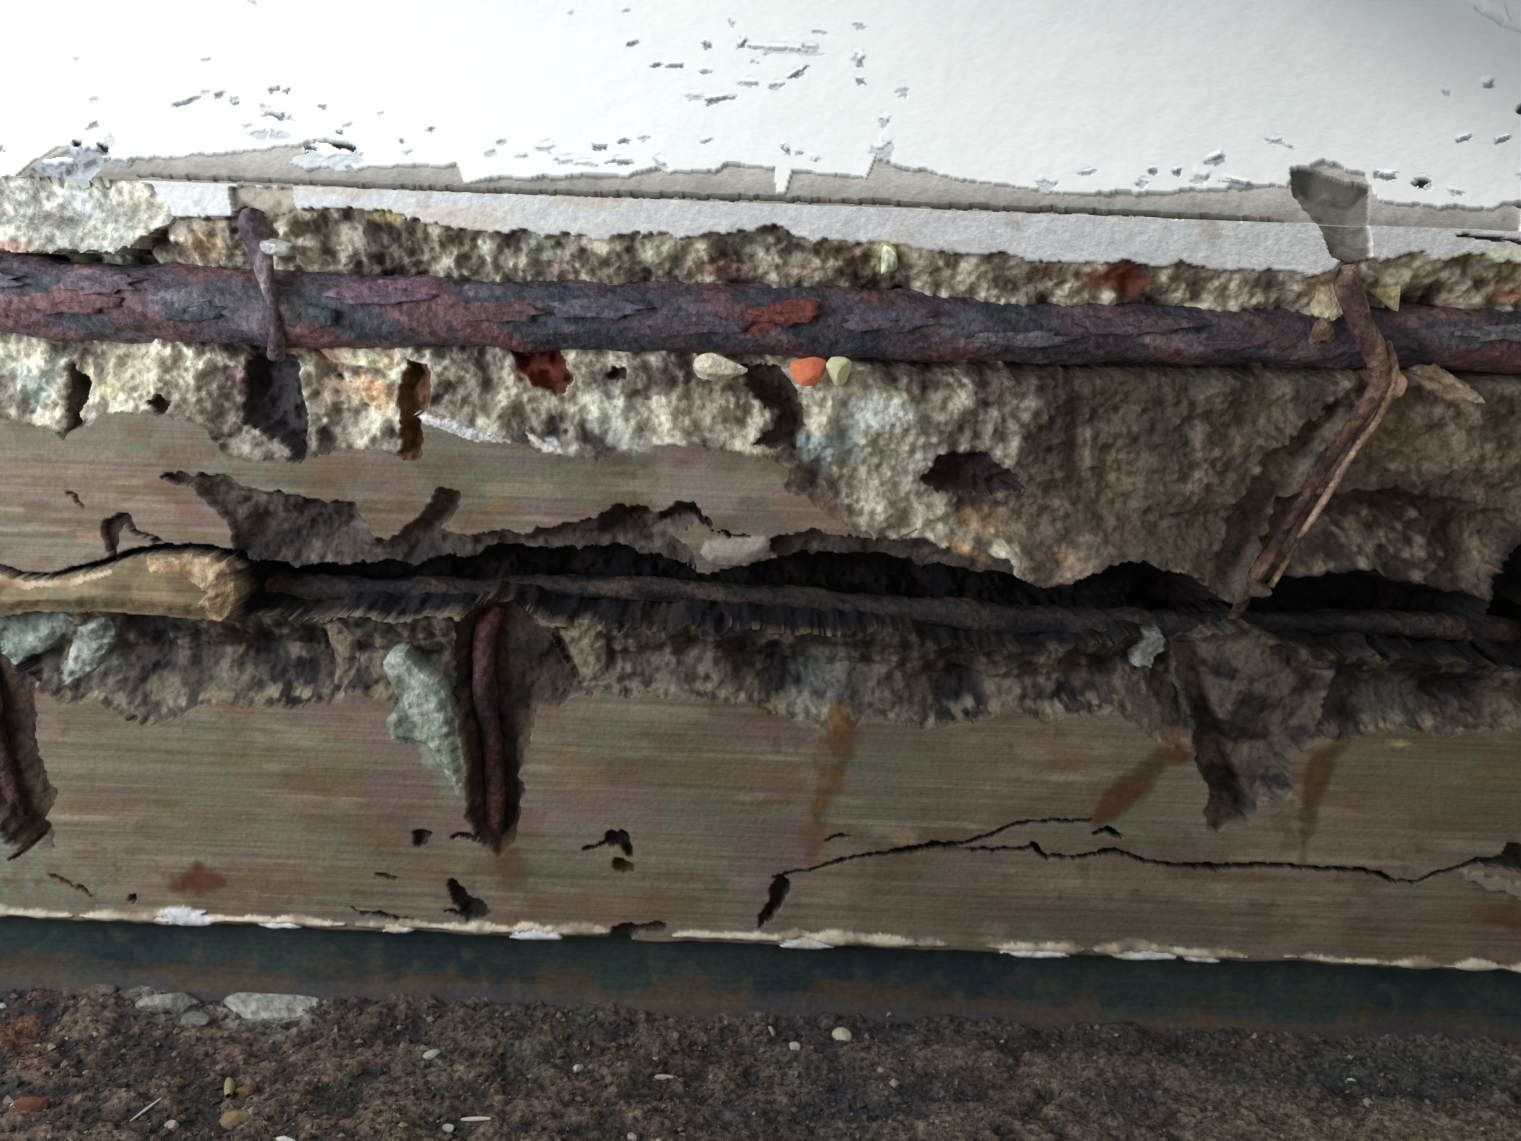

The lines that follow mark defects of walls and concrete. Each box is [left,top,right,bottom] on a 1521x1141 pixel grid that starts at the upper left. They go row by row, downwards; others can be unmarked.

peeling [1495,134,1511,146]
peeling [0,81,1315,269]
peeling [1308,161,1521,231]
spalling [266,208,1521,316]
rust [0,271,228,323]
rust [455,297,823,336]
rust [842,307,945,333]
rust [960,316,1279,351]
rust [1454,324,1521,342]
crack [0,512,258,580]
spalling [0,332,1521,753]
crack [773,818,1481,886]